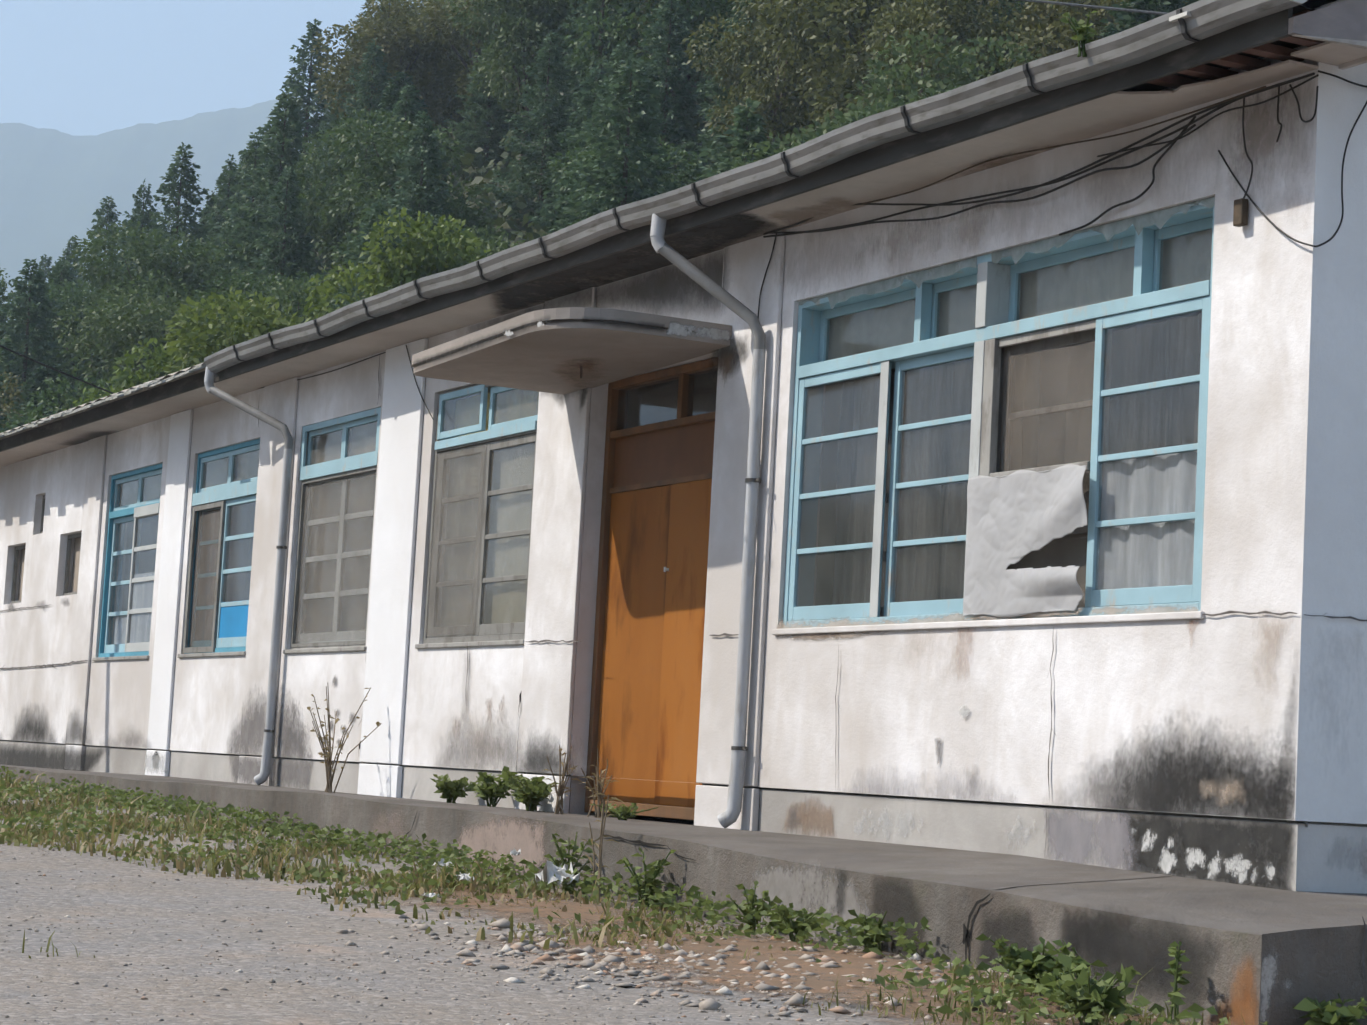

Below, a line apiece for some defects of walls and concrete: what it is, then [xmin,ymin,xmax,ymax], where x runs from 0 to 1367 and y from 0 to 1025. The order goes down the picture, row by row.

crack [1202,611,1367,621]
water stain [0,714,102,771]
water stain [230,698,310,786]
crack [1044,627,1056,857]
mould [1047,738,1292,891]
peeling [1142,830,1275,883]